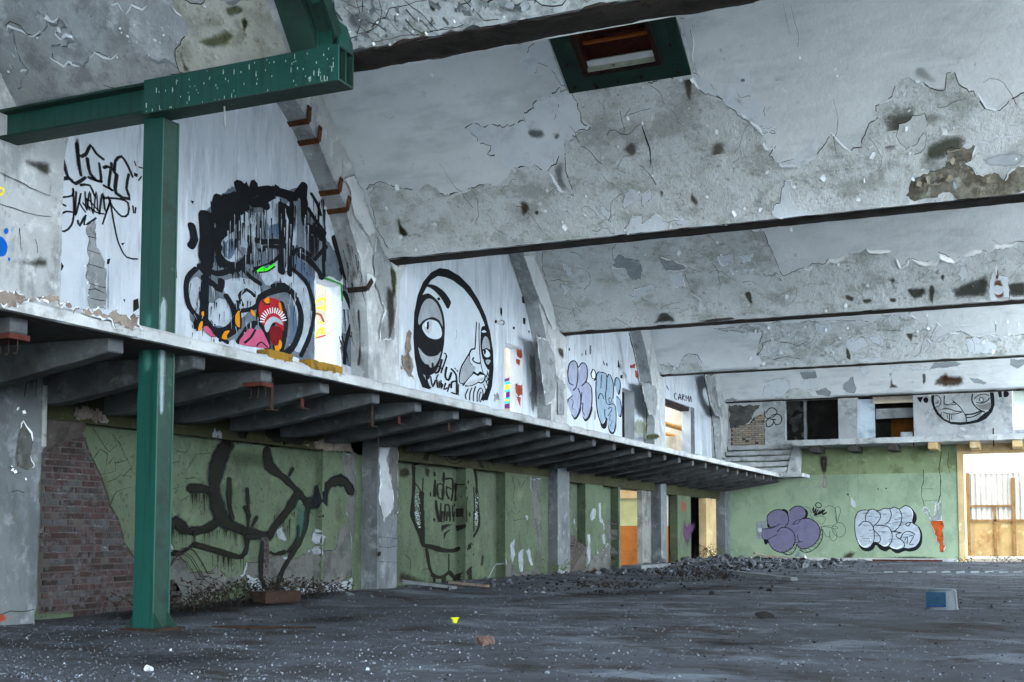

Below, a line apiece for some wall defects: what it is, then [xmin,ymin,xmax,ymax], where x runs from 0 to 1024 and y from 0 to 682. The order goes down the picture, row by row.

spalling [84,220,111,309]
peeling [343,15,1024,458]
flaking render [9,379,134,617]
crack [93,428,134,505]
peeling [378,438,399,522]